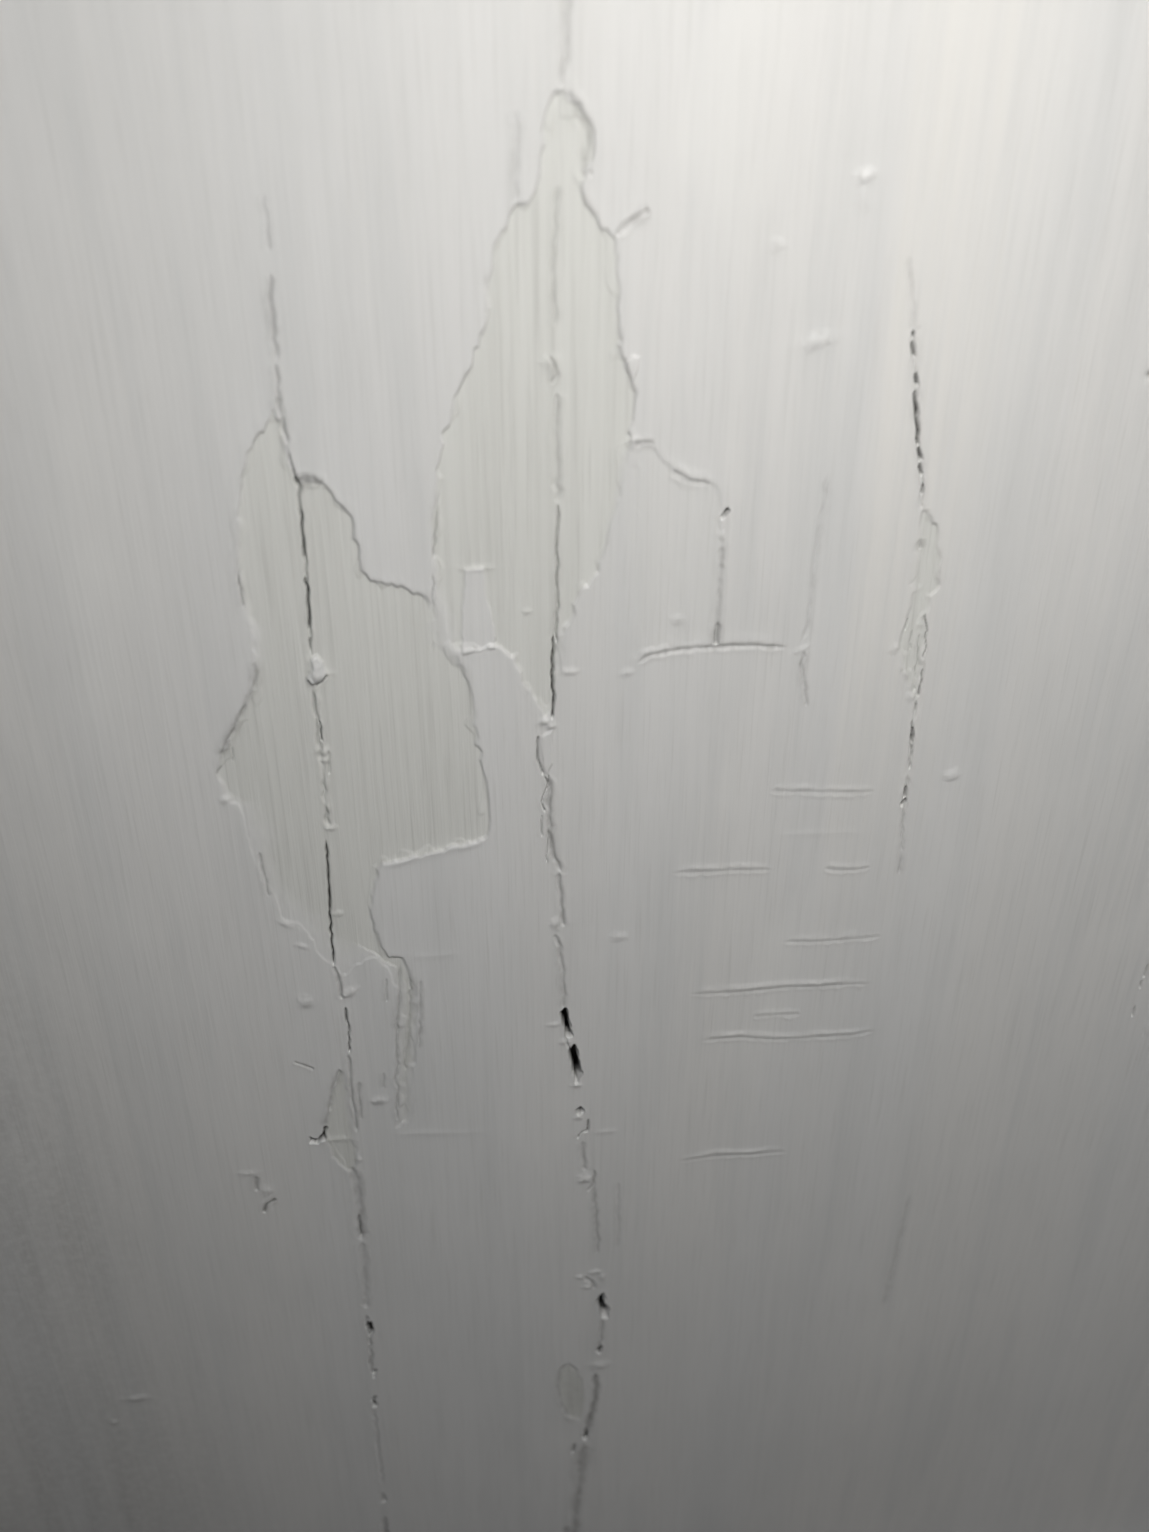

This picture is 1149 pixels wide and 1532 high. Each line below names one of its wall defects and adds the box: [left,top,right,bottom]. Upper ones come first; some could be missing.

crack [556,0,575,93]
crack [904,247,930,514]
crack [711,505,733,652]
crack [256,187,391,1532]
crack [532,173,623,1532]
crack [895,693,922,880]